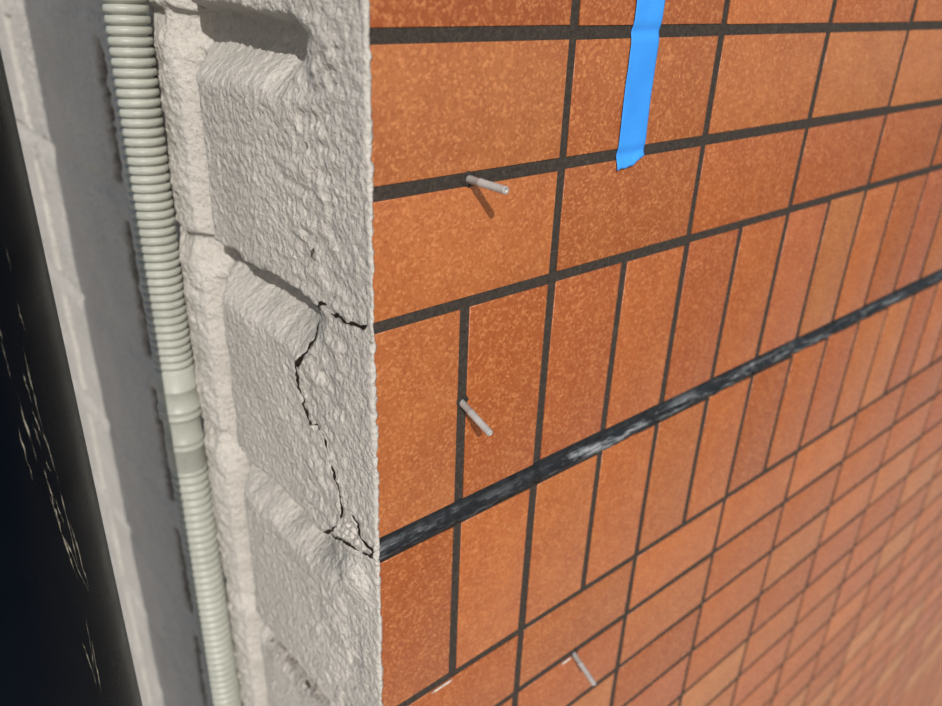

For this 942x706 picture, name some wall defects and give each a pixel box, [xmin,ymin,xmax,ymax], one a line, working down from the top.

crack [294,301,374,559]